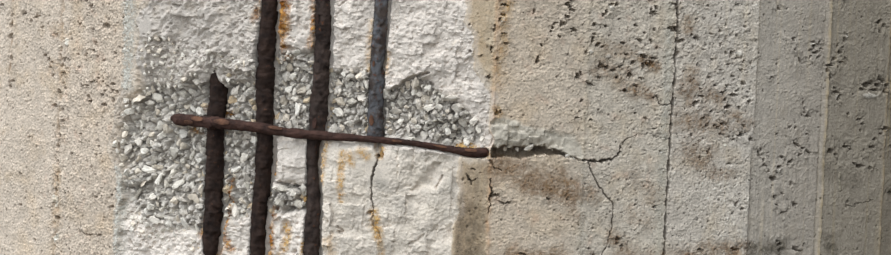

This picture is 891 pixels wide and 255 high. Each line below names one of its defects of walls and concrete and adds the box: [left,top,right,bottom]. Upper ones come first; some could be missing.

spalling [0,0,262,255]
rust [268,208,290,255]
rust [278,0,290,49]
spalling [265,0,316,255]
crack [370,154,381,238]
spalling [318,0,587,255]
crack [581,0,680,255]